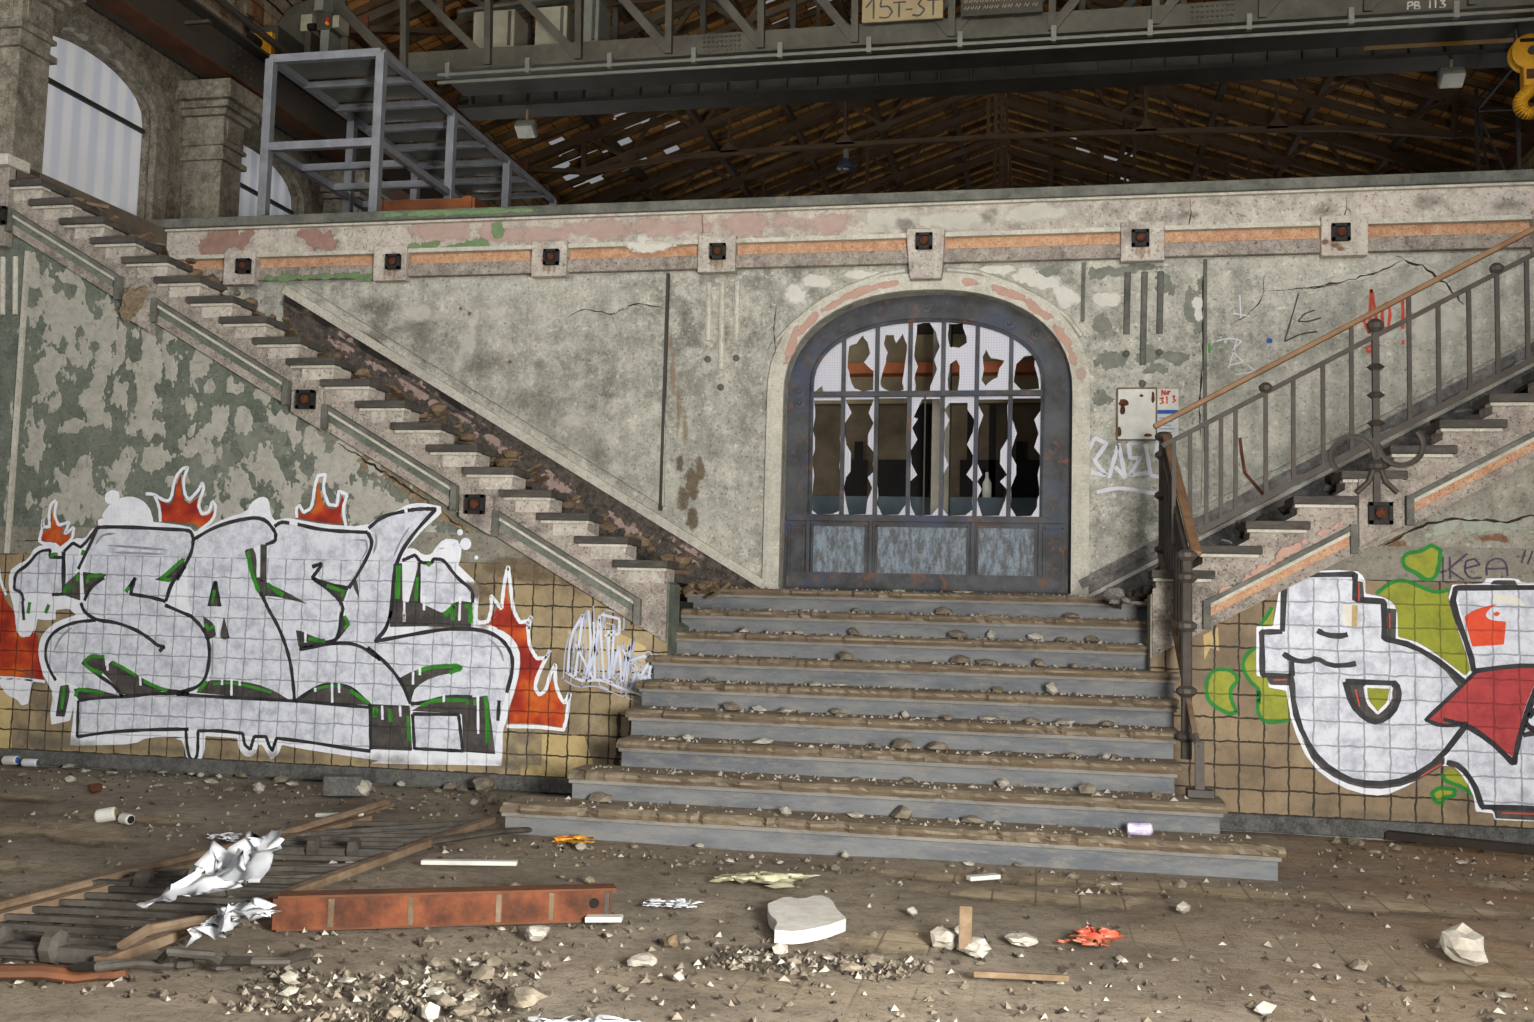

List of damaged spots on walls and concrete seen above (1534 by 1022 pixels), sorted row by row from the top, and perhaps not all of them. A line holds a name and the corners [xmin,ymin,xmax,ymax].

peeling [199,229,254,255]
peeling [297,228,339,251]
peeling [785,270,898,364]
peeling [453,304,510,373]
peeling [4,252,477,533]
peeling [453,412,508,453]
water stain [671,362,704,529]
peeling [541,470,579,503]
peeling [608,511,642,536]
crack [1379,514,1534,546]